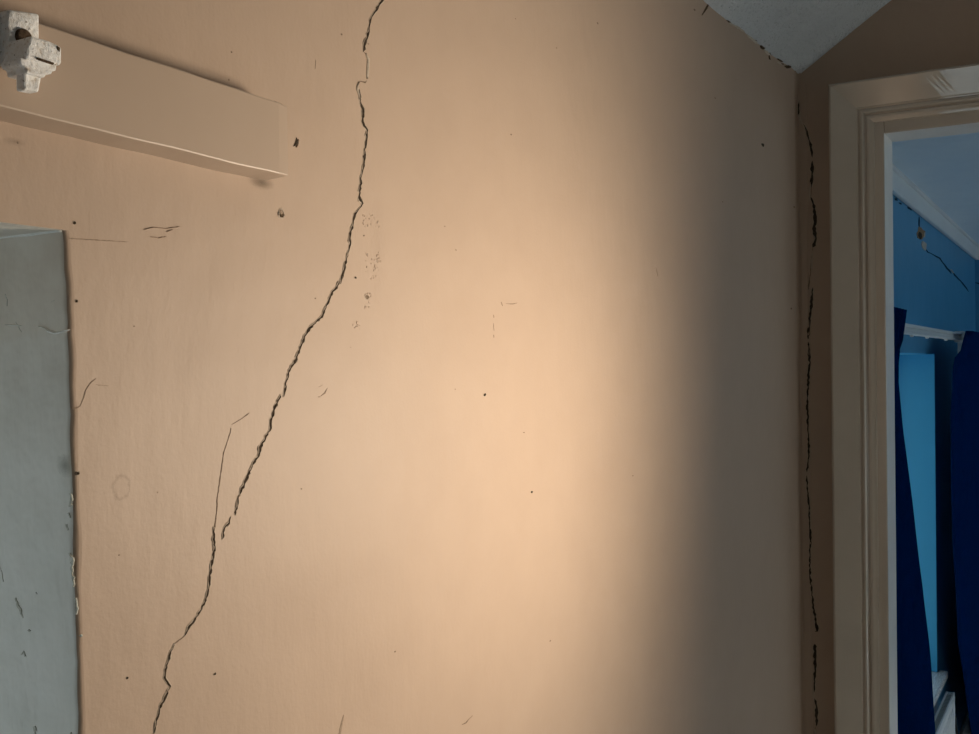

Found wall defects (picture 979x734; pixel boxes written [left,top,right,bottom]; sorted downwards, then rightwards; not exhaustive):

crack [153,0,384,734]
crack [797,101,819,734]
crack [916,217,979,292]